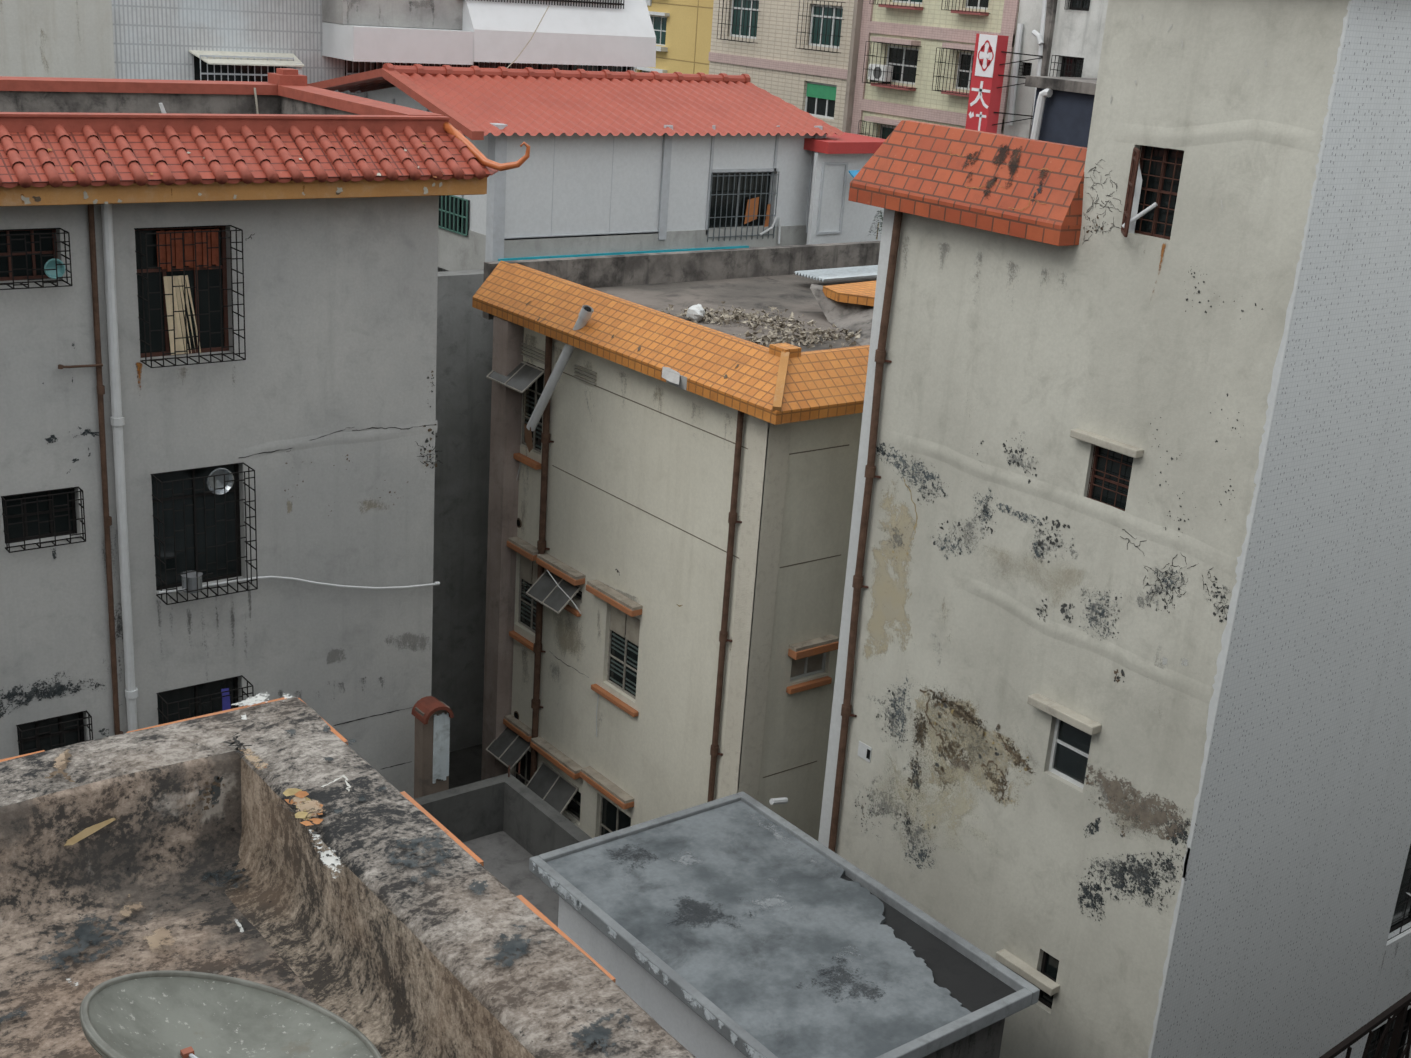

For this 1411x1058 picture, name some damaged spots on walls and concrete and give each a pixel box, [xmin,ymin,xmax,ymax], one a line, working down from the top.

leakage [963,145,1022,195]
crack [239,424,437,458]
mould [876,443,947,503]
mould [996,503,1074,563]
mould [0,673,104,718]
mould [876,677,911,748]
spalling [277,788,332,830]
mould [1078,848,1191,926]